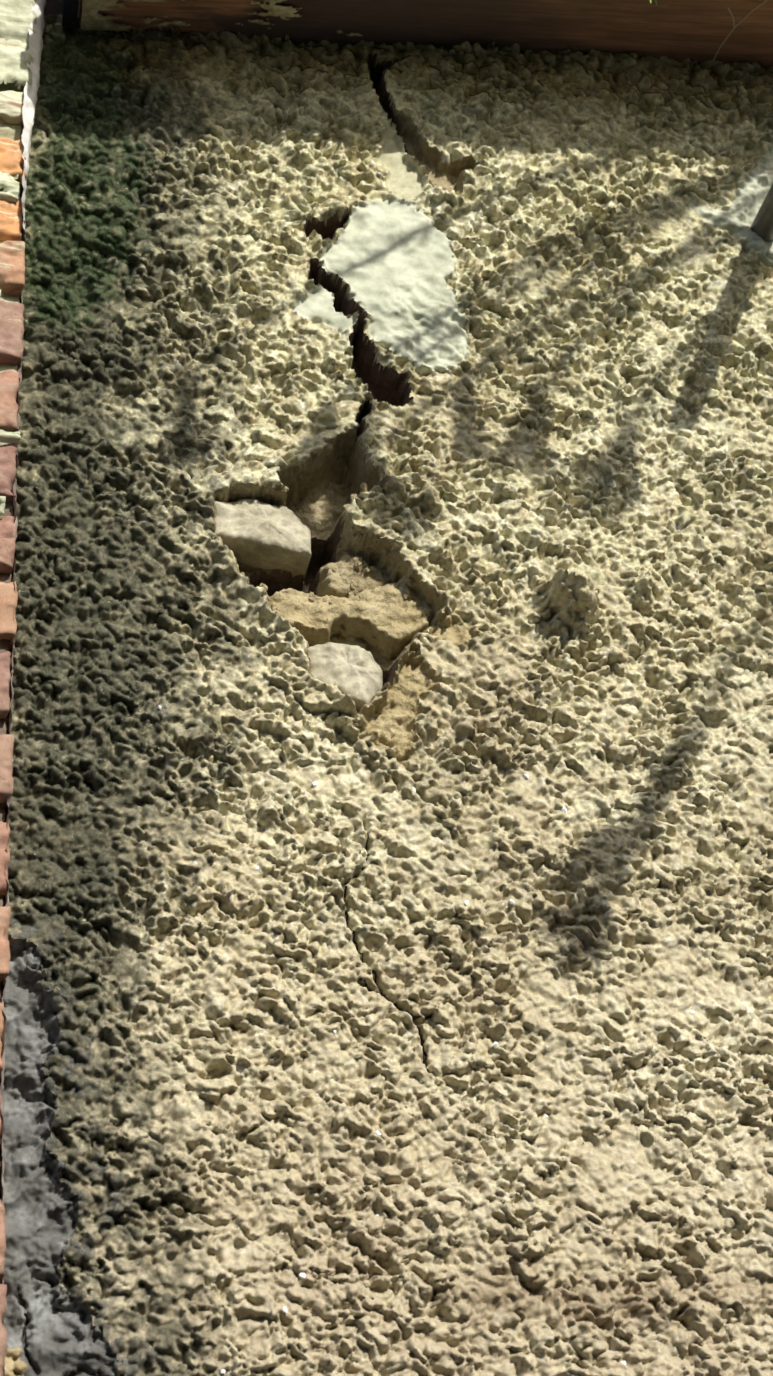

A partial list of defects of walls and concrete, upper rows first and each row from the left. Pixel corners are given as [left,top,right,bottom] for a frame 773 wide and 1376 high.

peeling [81,0,190,32]
peeling [236,0,302,29]
flaking render [0,0,46,242]
crack [366,53,480,201]
peeling [293,285,359,335]
crack [304,207,414,438]
flaking render [0,429,21,445]
spalling [211,423,479,764]
water stain [3,15,253,1376]